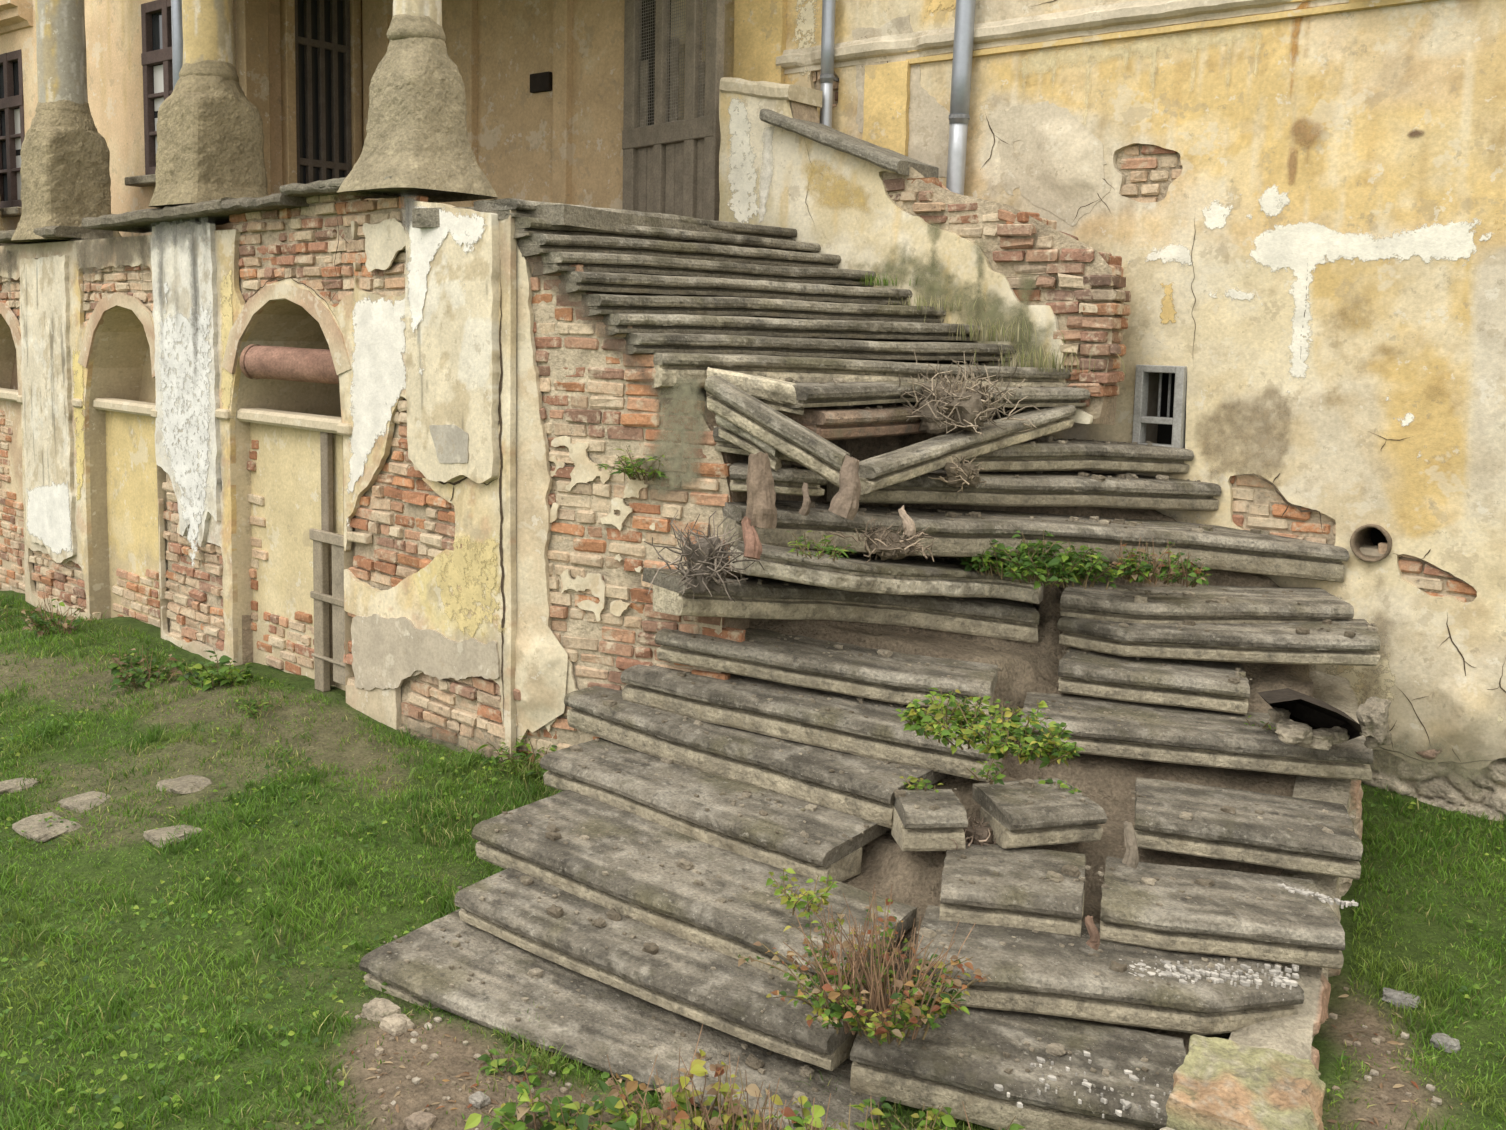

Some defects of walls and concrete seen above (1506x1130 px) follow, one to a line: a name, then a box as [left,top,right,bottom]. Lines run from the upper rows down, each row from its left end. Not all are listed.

peeling [793,0,818,49]
flaking render [852,14,914,40]
flaking render [800,52,1183,407]
peeling [1202,184,1506,393]
flaking render [0,194,521,761]
flaking render [1230,474,1336,545]
flaking render [1378,542,1477,602]
crack [1393,549,1473,587]
crack [1438,615,1506,693]
flaking render [1257,644,1506,821]
crack [1378,689,1499,764]